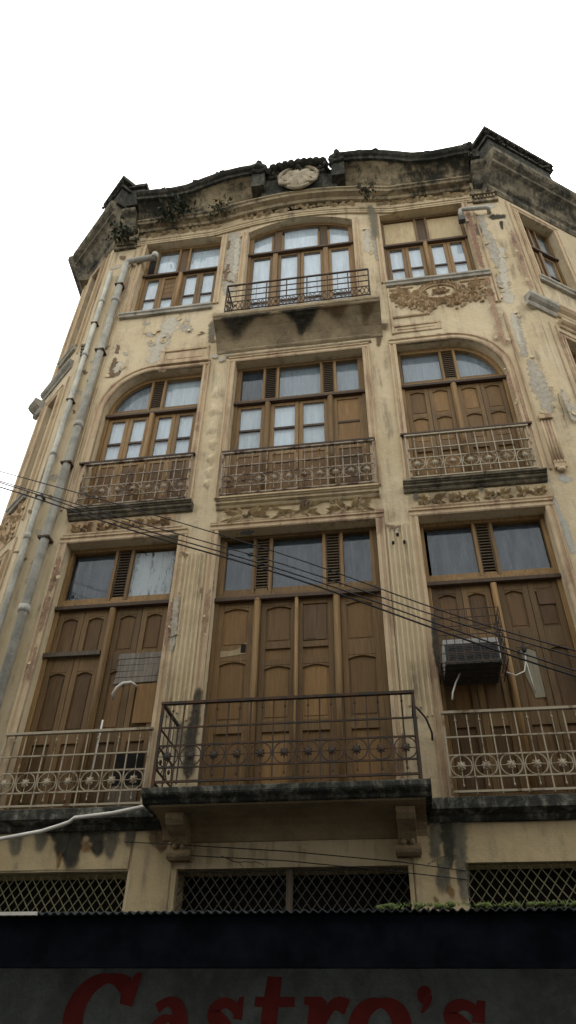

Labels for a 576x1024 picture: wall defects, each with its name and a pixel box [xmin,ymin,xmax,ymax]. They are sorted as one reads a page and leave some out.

peeling [221,232,242,295]
peeling [105,344,127,378]
peeling [143,316,232,372]
damp [208,303,347,342]
damp [360,302,375,321]
peeling [475,203,576,427]
damp [177,688,203,777]
damp [9,837,22,854]
damp [35,830,136,869]
damp [428,814,469,901]